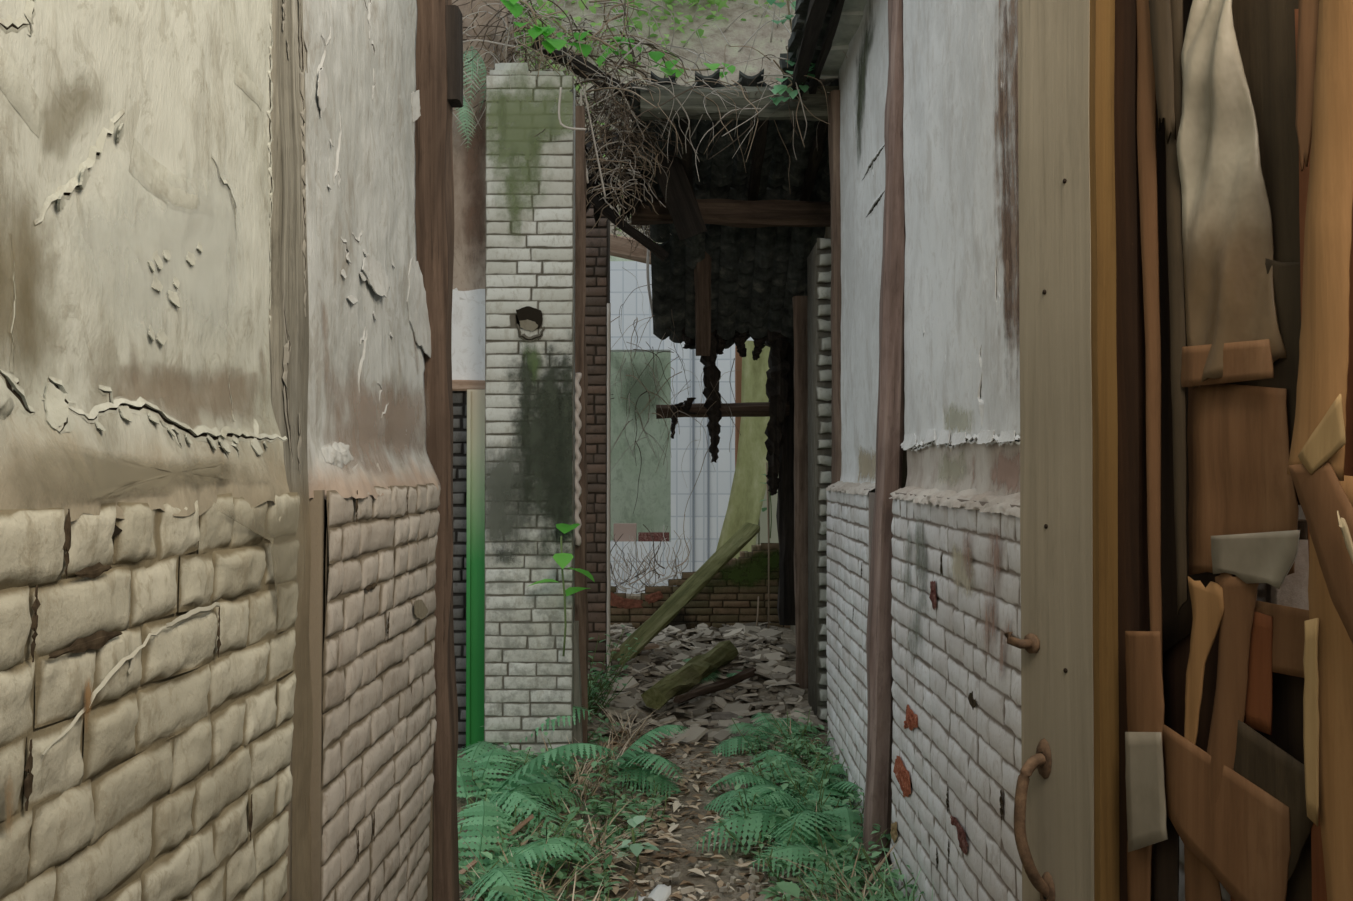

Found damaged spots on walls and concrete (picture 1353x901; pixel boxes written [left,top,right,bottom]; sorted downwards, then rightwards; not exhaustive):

flaking render [411,90,421,122]
peeling [33,109,125,226]
damp [0,212,38,350]
peeling [121,193,232,313]
flaking render [341,249,431,358]
spalling [41,375,77,434]
spalling [118,406,268,455]
damp [485,348,572,563]
flaking render [900,429,1020,451]
crack [43,602,220,755]